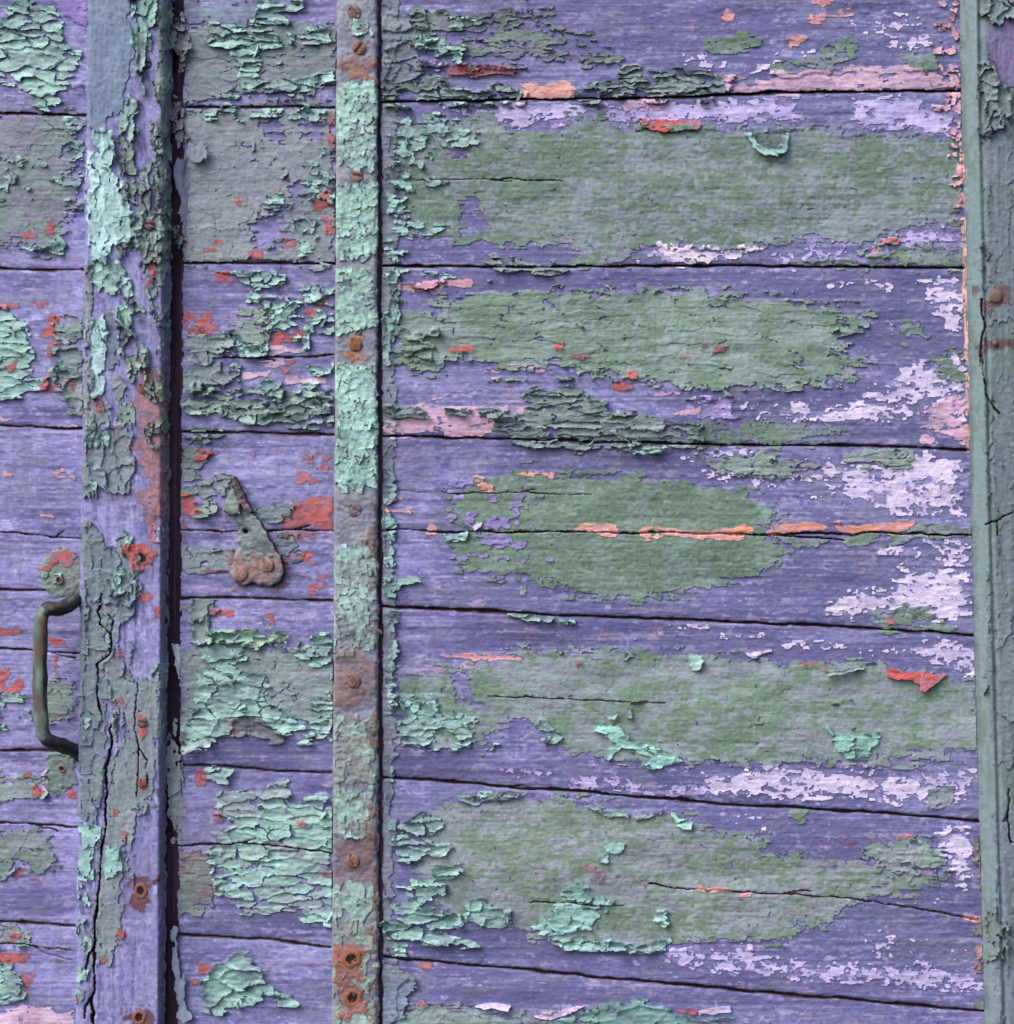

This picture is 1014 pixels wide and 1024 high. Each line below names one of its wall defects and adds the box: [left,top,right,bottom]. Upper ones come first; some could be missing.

peeling [0,0,378,498]
peeling [380,0,970,605]
corrosion [125,359,169,545]
corrosion [361,523,377,591]
crack [383,527,687,535]
crack [745,513,1013,541]
crack [0,594,148,1024]
peeling [47,520,168,967]
corrosion [127,875,160,912]
corrosion [333,807,378,1022]
peeling [163,520,983,1024]
crack [731,890,975,919]